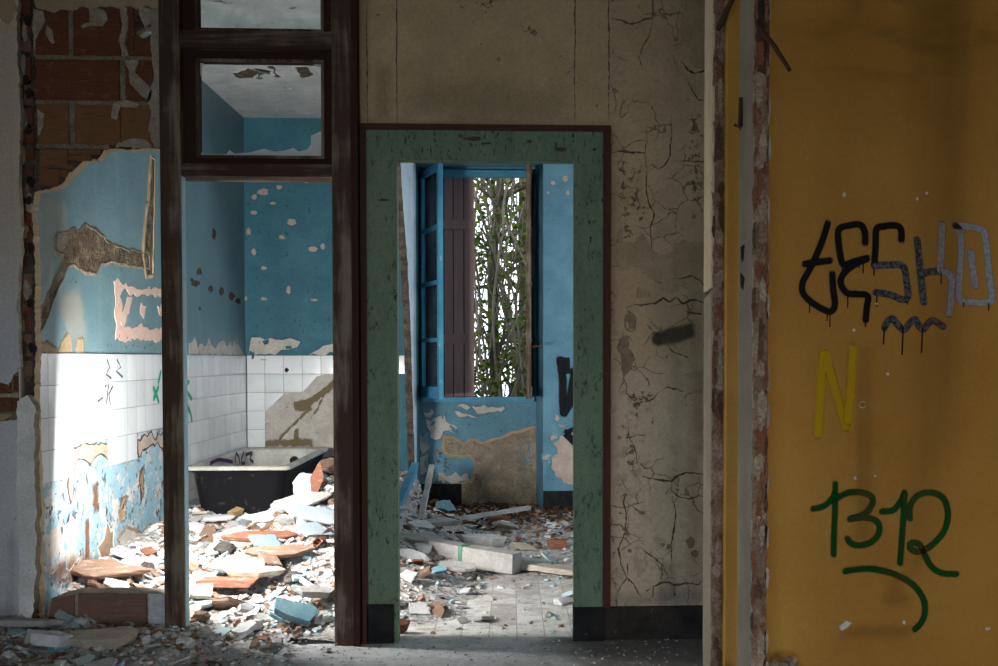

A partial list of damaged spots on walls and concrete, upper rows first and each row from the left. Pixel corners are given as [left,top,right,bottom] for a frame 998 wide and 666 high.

crack [607,0,654,109]
crack [681,61,705,101]
flaking render [0,0,162,421]
crack [612,123,704,249]
crack [626,275,704,315]
peeling [43,442,108,579]
peeling [97,430,163,557]
peeling [265,374,334,458]
peeling [420,402,507,484]
peeling [519,412,573,486]
crack [613,386,702,598]